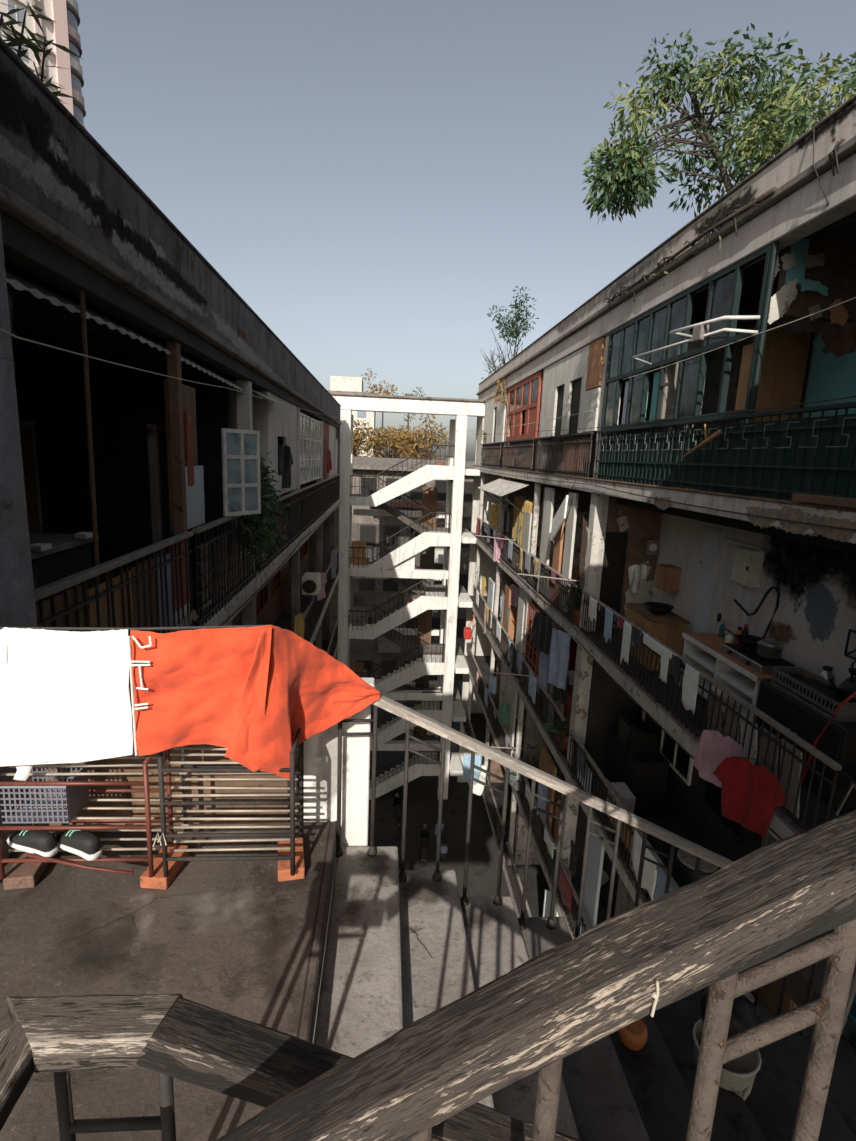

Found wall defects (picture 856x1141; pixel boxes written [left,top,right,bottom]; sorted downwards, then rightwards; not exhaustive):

leakage [0,63,208,305]
peeling [768,249,856,357]
spalling [746,505,856,544]